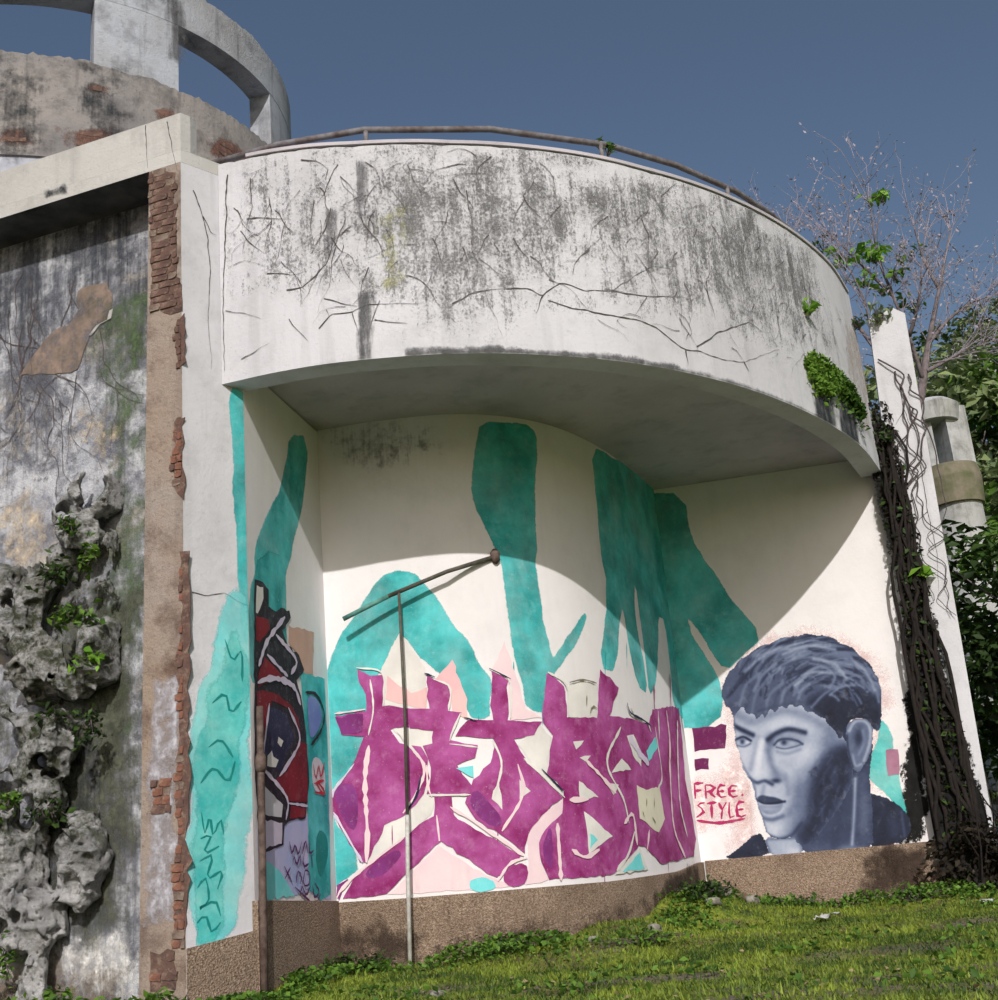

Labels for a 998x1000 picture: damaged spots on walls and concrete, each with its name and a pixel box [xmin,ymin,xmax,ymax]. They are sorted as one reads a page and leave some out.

water stain [168,0,185,63]
flaking render [66,129,110,146]
water stain [83,80,125,136]
crack [145,121,177,168]
peeling [21,282,114,375]
water stain [0,213,137,450]
spalling [148,168,187,369]
crack [193,174,776,371]
spalling [169,417,186,500]
water stain [228,145,996,899]
spalling [148,551,193,992]
water stain [47,884,138,1000]